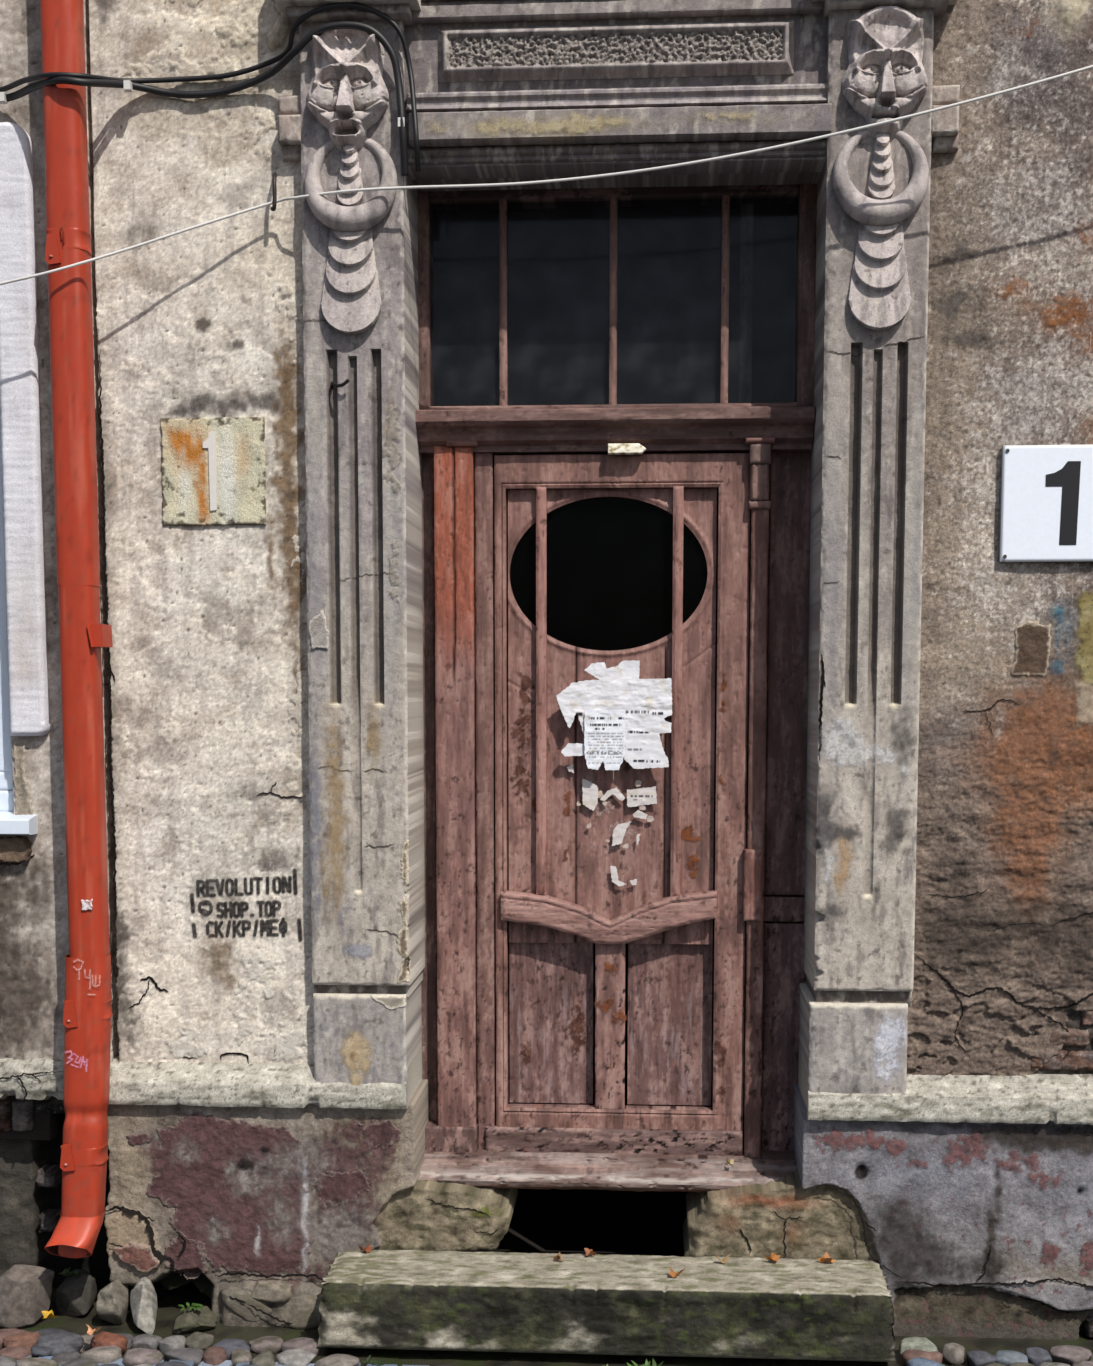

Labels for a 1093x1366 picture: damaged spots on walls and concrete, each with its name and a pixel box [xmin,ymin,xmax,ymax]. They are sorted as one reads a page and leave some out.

leakage [170,345,307,614]
crack [98,350,168,1049]
crack [914,953,1093,1059]
flaking render [1030,1009,1093,1075]
flaking render [0,1095,65,1141]
flaking render [35,1164,62,1188]
flaking render [38,1208,61,1233]
crack [105,1206,186,1283]
peeling [113,1111,401,1291]
crack [739,1210,803,1257]
crack [814,1184,1093,1314]
crack [215,1272,323,1325]